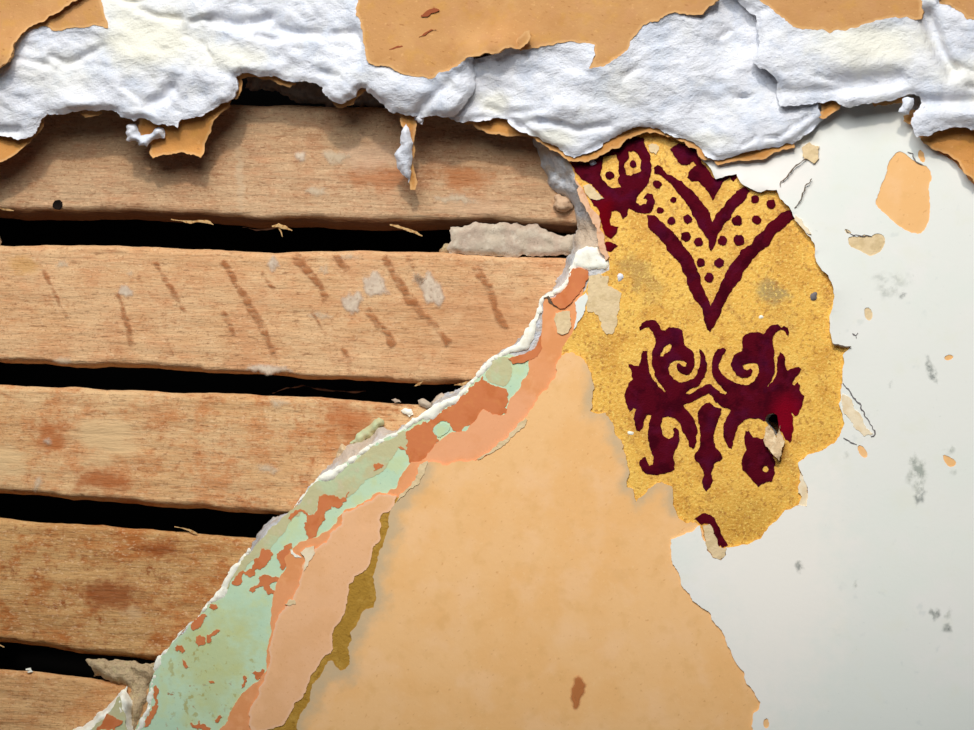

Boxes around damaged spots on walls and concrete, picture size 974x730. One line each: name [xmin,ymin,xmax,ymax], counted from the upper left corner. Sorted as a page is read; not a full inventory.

peeling [135,336,542,730]
peeling [551,268,589,329]
peeling [671,97,974,730]